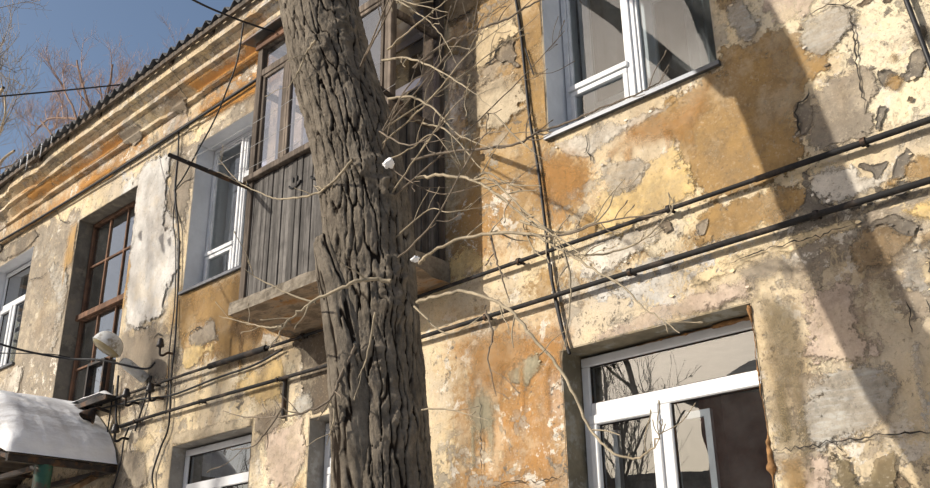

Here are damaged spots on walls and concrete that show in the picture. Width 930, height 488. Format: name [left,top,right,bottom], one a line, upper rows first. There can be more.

peeling [444,0,546,136]
crack [810,0,866,112]
peeling [0,230,39,262]
peeling [555,0,930,488]
peeling [182,318,219,369]
crack [773,431,926,453]